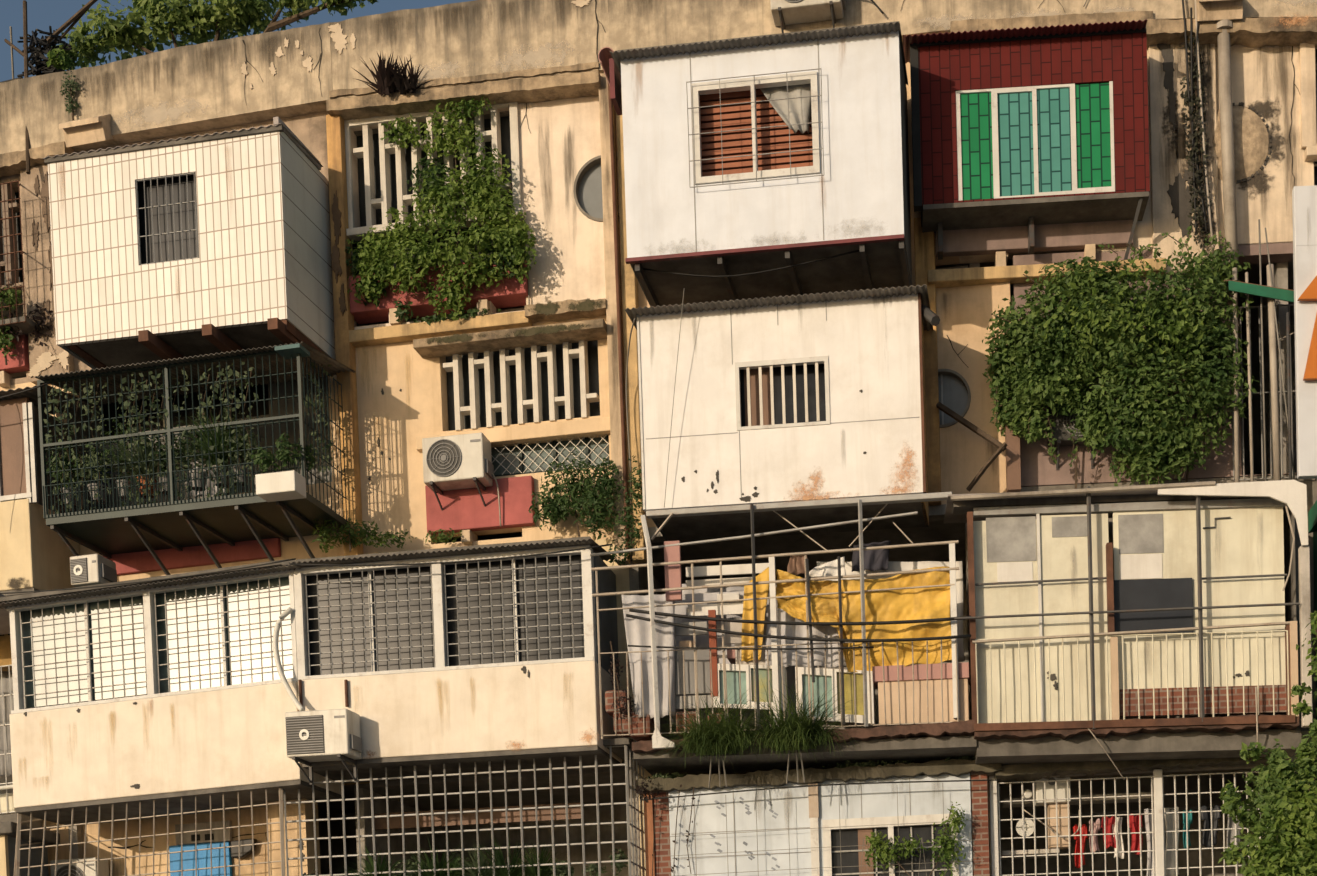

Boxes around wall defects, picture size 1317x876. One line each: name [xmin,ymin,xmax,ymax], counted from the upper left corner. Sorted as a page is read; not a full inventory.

peeling [269,37,313,76]
peeling [328,23,356,54]
leakage [414,63,458,81]
leakage [1239,47,1286,194]
leakage [1162,48,1217,255]
flaking render [28,172,70,378]
corrosion [795,475,842,501]